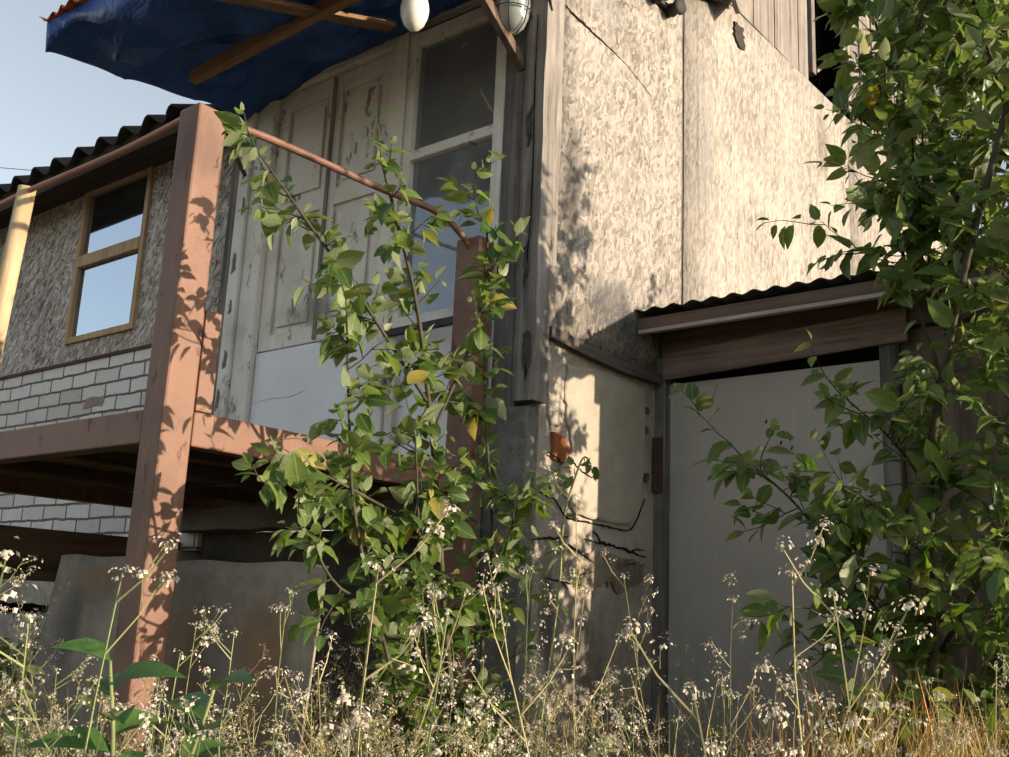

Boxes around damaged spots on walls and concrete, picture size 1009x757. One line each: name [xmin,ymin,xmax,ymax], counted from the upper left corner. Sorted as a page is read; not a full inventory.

spalling [546,345,571,463]
crack [531,452,647,558]